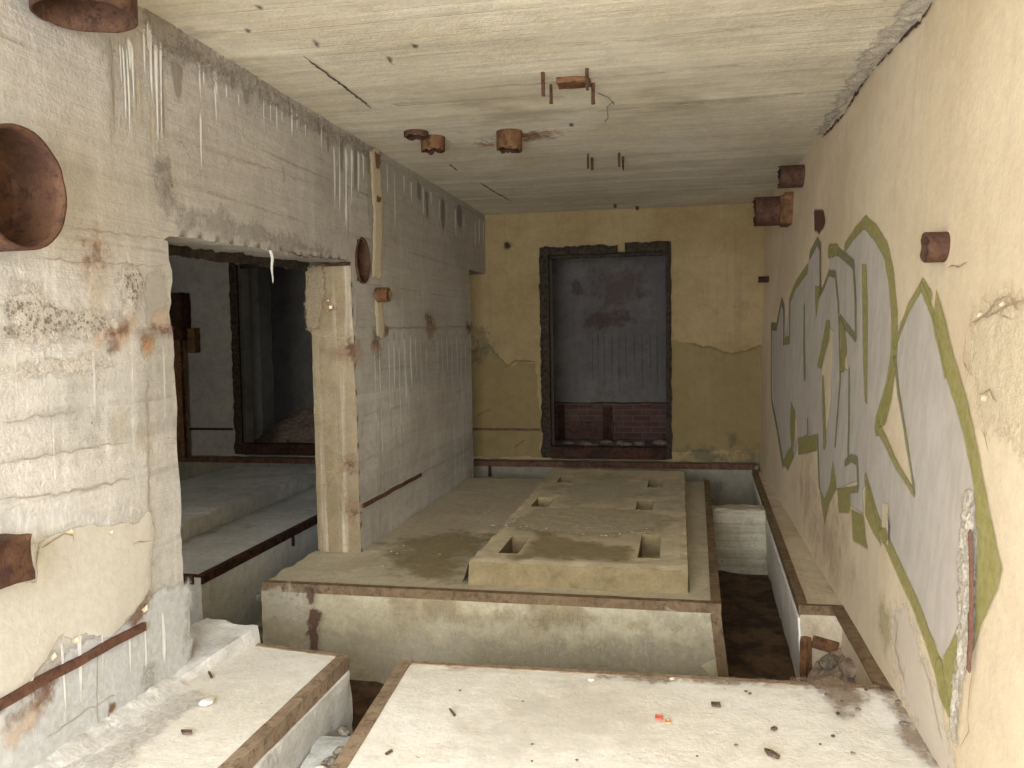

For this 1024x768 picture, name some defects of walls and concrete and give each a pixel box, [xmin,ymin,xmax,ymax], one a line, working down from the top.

damp [110,22,182,138]
damp [198,61,462,235]
crack [305,57,371,108]
corrosion [97,310,171,353]
flaking render [963,292,1024,456]
peeling [0,511,215,768]
corrosion [305,587,321,651]
peeling [892,488,976,768]